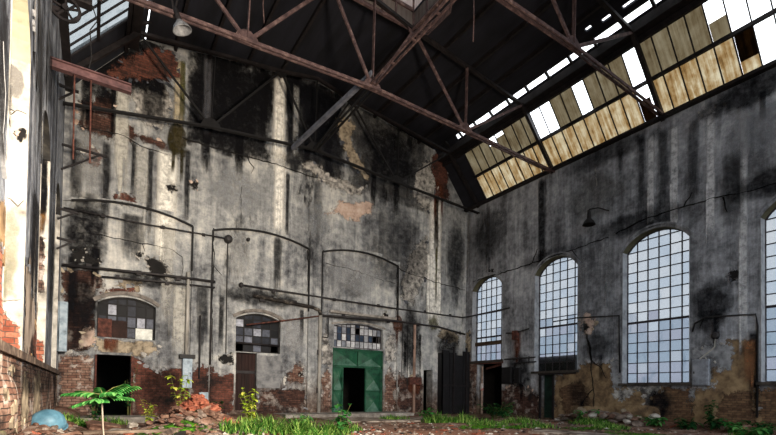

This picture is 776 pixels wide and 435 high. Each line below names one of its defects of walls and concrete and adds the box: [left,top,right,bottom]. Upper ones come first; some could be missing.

flaking render [75,97,118,167]
flaking render [113,189,137,208]
flaking render [107,47,182,151]
leakage [274,76,299,228]
peeling [302,117,374,222]
flaking render [0,201,234,435]
flaking render [320,329,333,411]
flaking render [384,329,424,413]
flaking render [554,338,776,427]